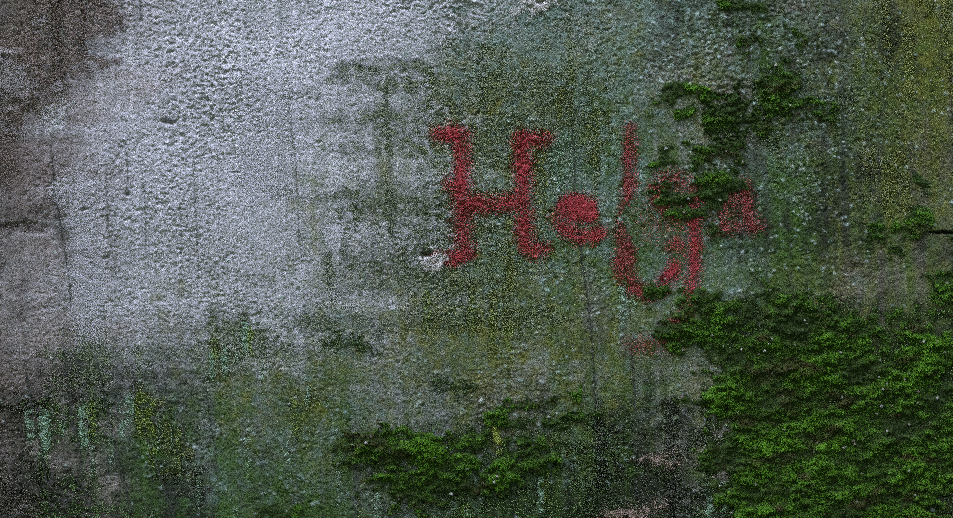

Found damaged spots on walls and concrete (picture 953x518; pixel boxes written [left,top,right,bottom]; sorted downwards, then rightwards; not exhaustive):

crack [923,228,953,236]
leakage [25,410,50,451]
leakage [79,404,89,444]
leakage [592,396,727,518]